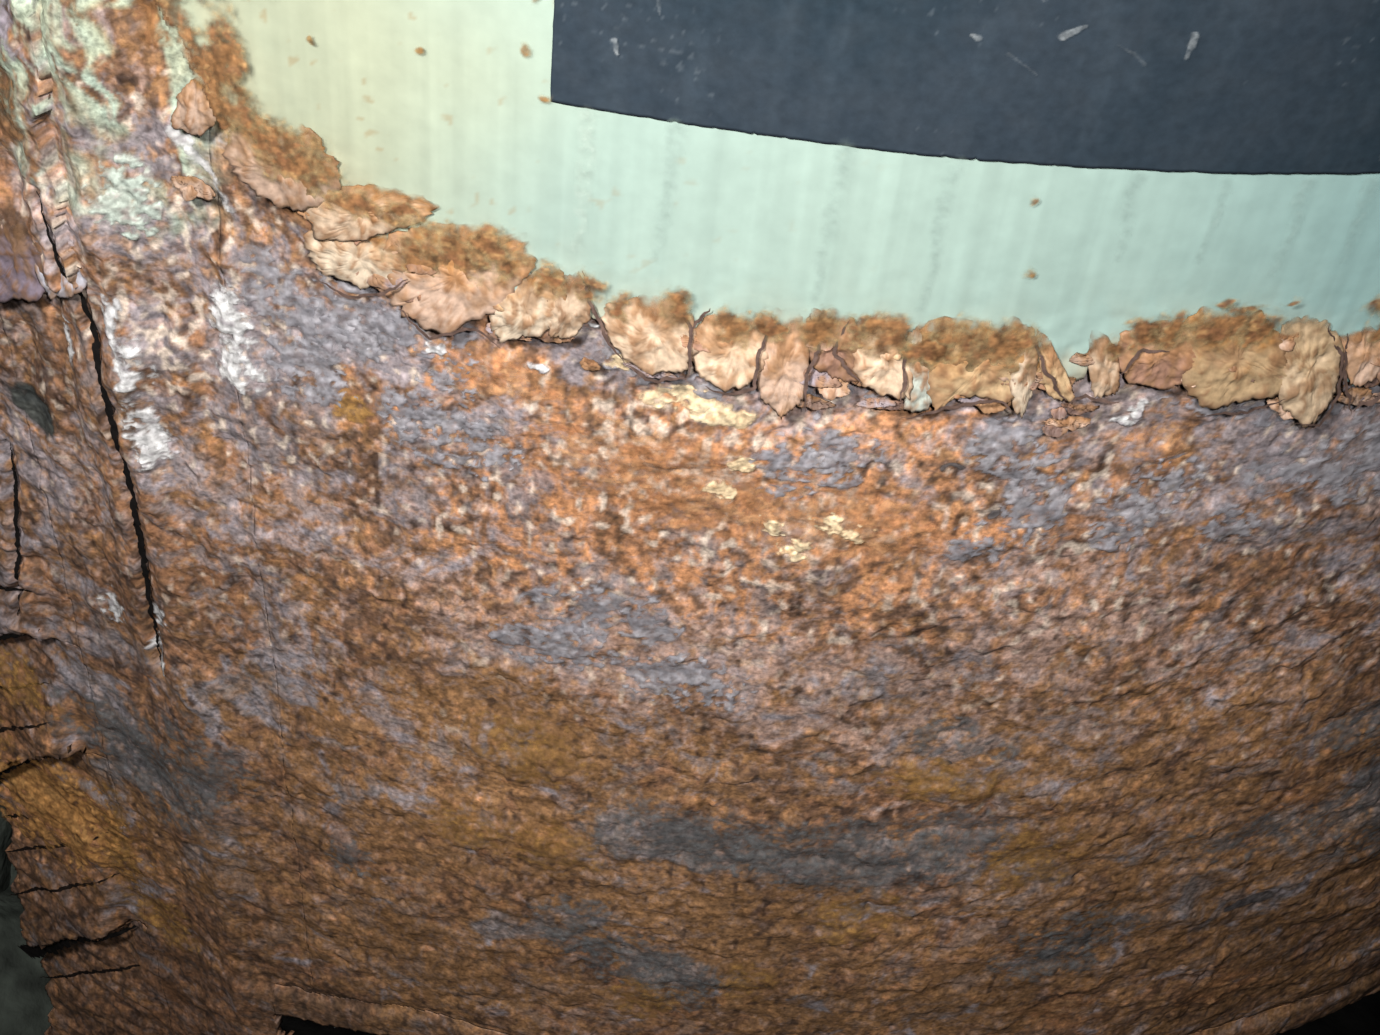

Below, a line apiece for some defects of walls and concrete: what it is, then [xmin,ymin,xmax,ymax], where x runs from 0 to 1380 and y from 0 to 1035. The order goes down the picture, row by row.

rust [0,0,47,172]
rust [133,0,514,285]
crack [36,191,162,667]
rust [435,340,563,412]
rust [535,259,629,322]
rust [662,290,692,326]
rust [559,417,934,557]
peeling [170,78,1380,438]
rust [716,307,1039,373]
rust [1105,299,1299,358]
rust [1367,298,1380,343]
rust [0,735,200,952]